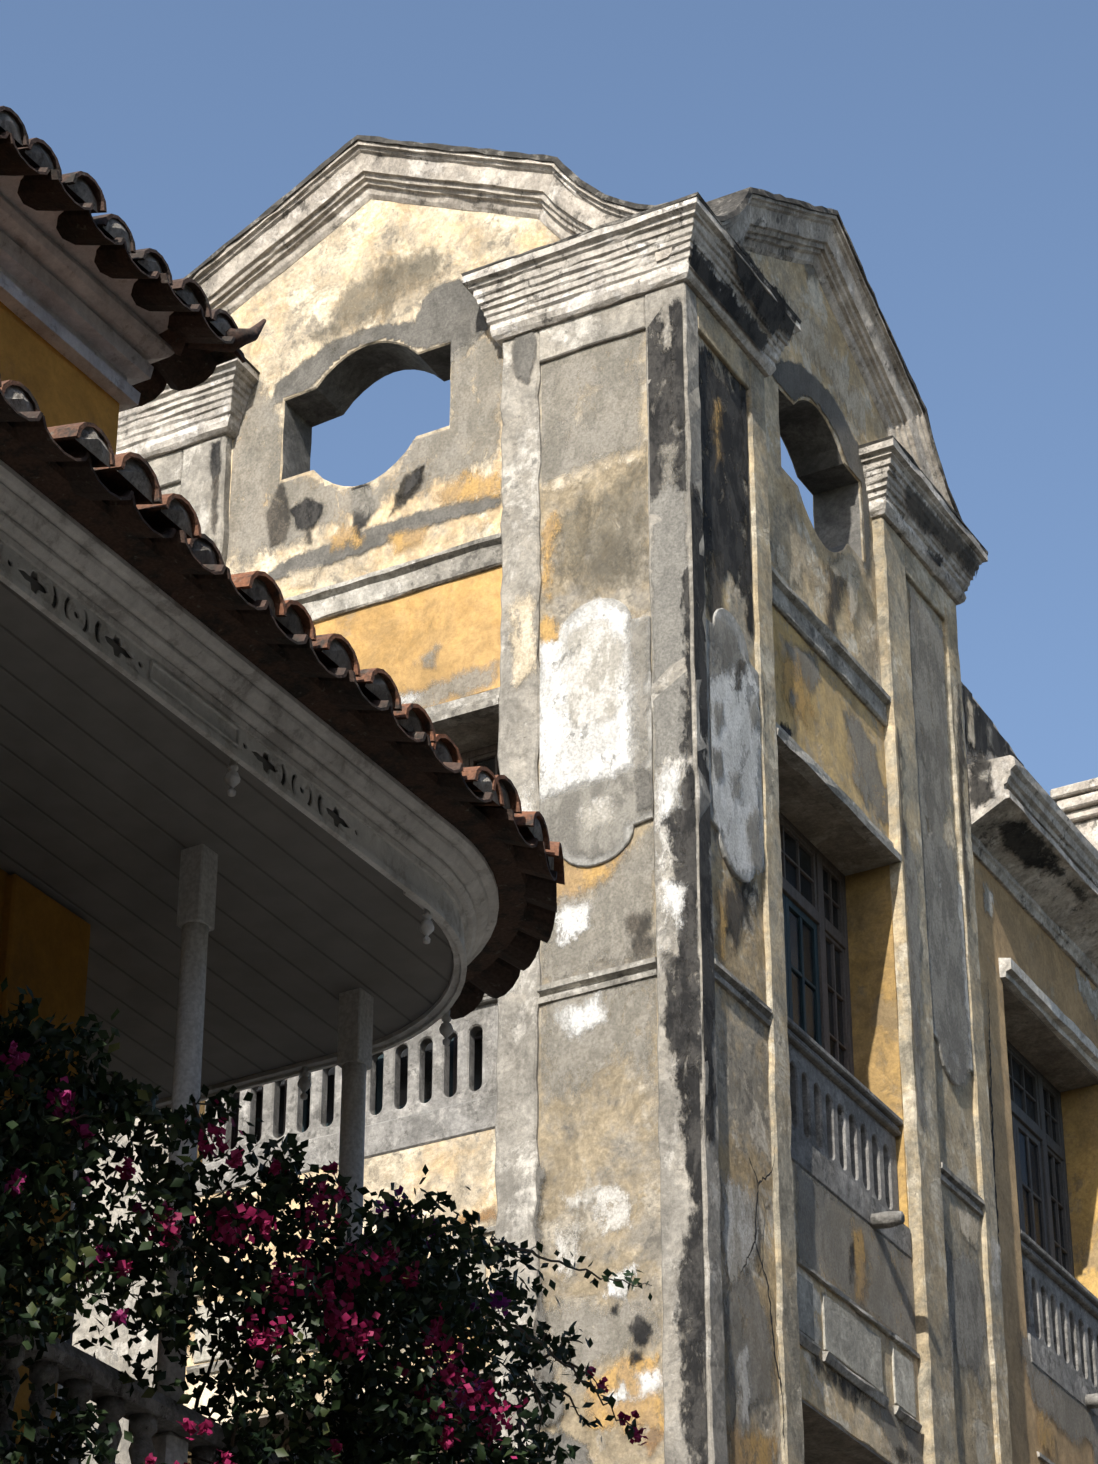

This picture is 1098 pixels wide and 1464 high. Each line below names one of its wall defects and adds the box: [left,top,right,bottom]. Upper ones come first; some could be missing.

water stain [267,483,323,547]
peeling [330,524,362,549]
water stain [352,508,372,540]
water stain [390,465,425,516]
peeling [393,528,425,553]
peeling [289,567,320,587]
peeling [401,511,697,970]
peeling [710,664,763,880]
water stain [538,299,759,1464]
water stain [533,1163,565,1432]
crack [737,1147,785,1443]